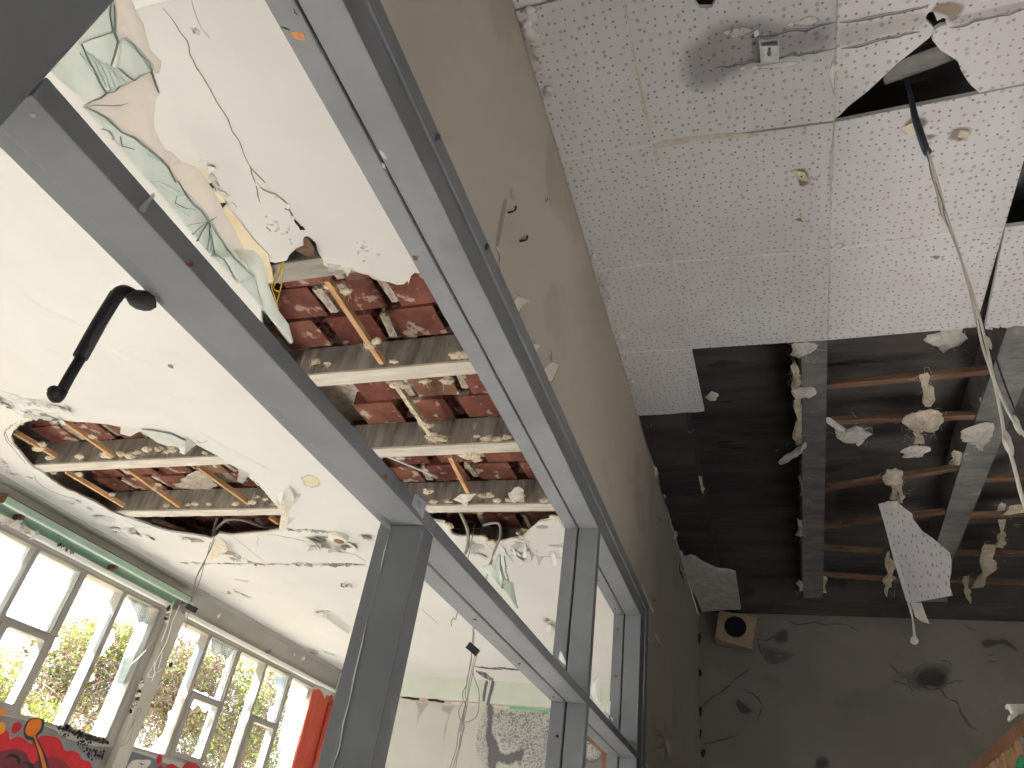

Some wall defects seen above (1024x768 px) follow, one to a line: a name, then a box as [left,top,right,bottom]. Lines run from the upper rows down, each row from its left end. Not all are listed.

crack [165,0,316,258]
peeling [194,160,273,283]
spalling [316,248,414,285]
peeling [120,425,141,436]
peeling [0,458,155,541]
peeling [442,514,564,567]
spalling [878,485,953,645]